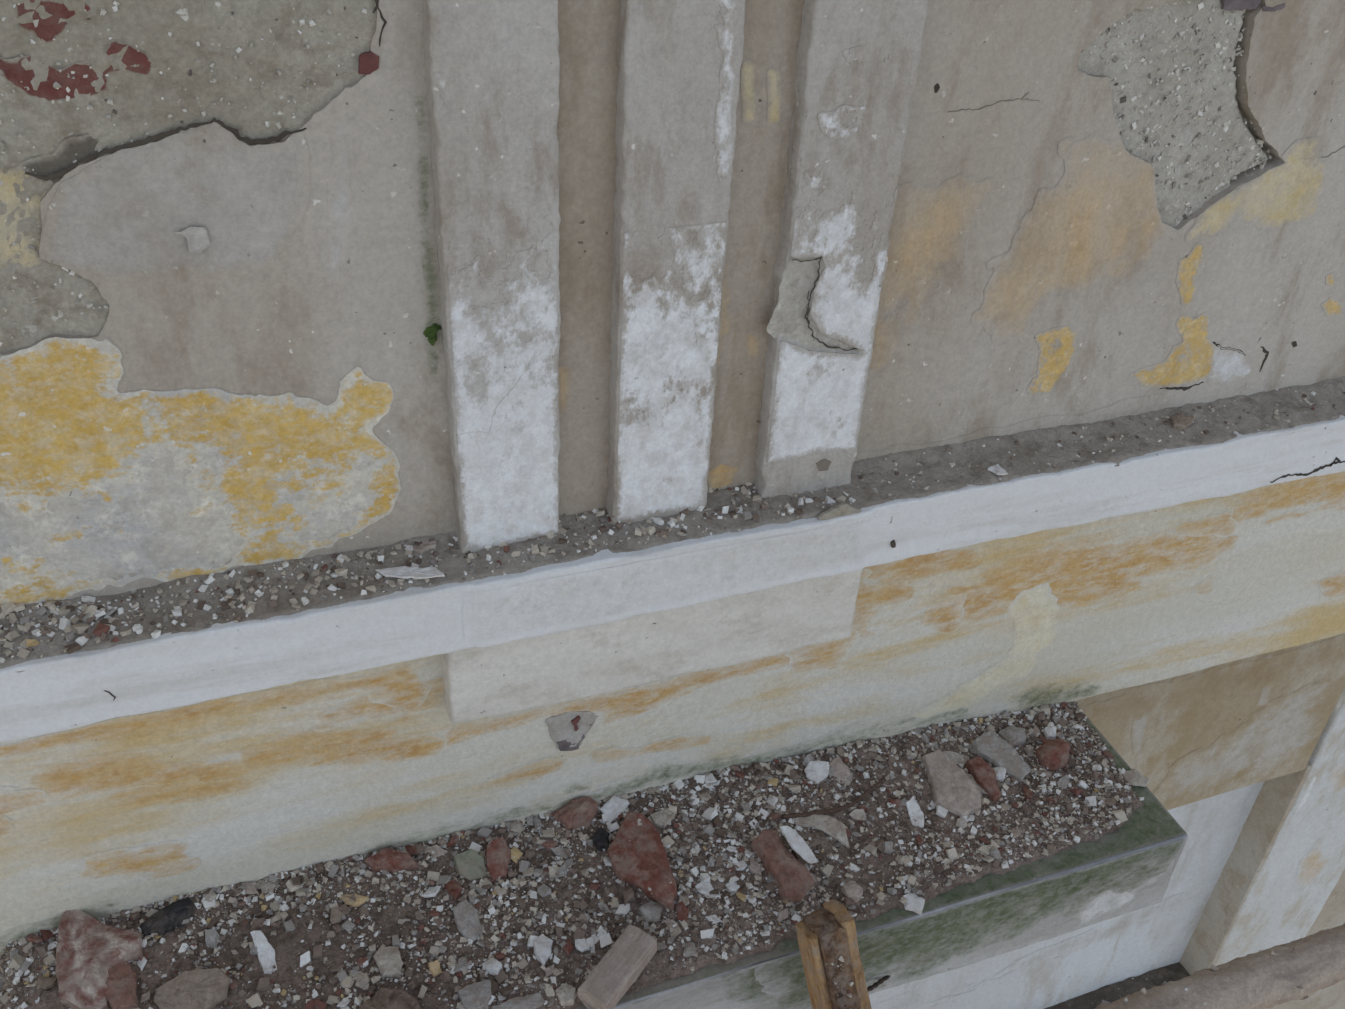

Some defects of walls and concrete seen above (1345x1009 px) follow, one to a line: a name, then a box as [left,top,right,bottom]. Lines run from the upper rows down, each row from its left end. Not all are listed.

crack [25,118,307,181]
crack [949,92,1039,112]
flaking render [1078,0,1285,227]
peeling [0,0,401,607]
peeling [767,159,897,471]
peeling [1026,325,1078,396]
peeling [1129,244,1216,388]
crack [1270,457,1345,483]
leakage [875,583,1060,740]